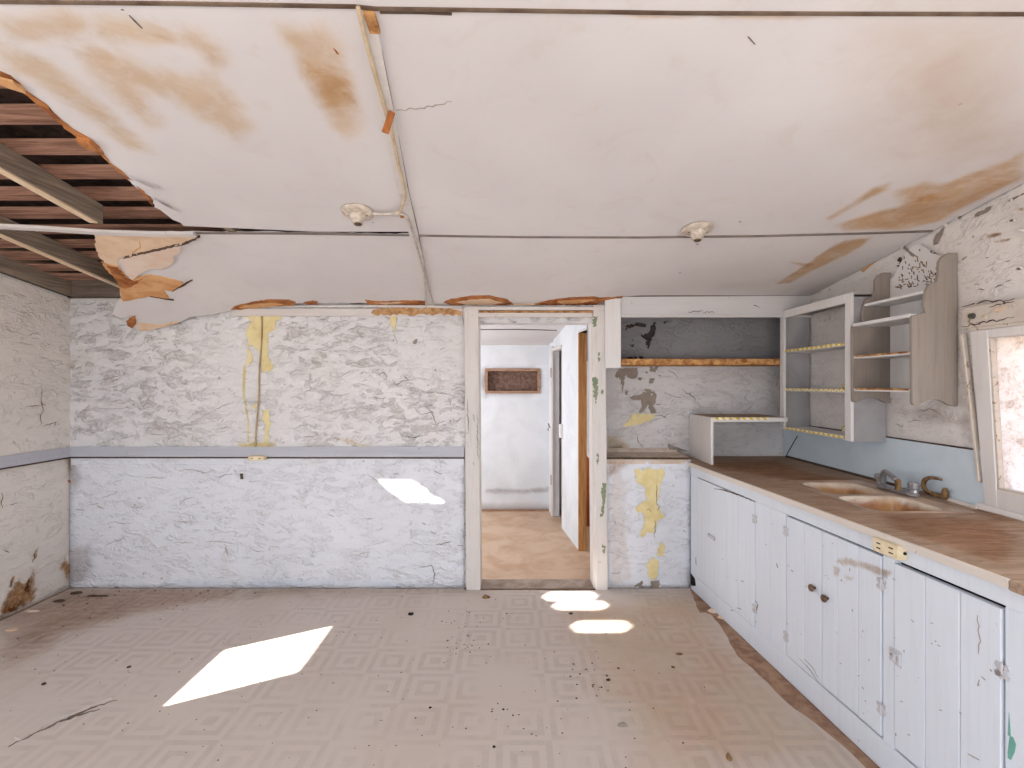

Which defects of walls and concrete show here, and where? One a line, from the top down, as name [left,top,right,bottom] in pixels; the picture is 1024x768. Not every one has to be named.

crack [396,101,452,111]
peeling [245,316,285,372]
peeling [615,319,669,427]
peeling [634,468,665,588]